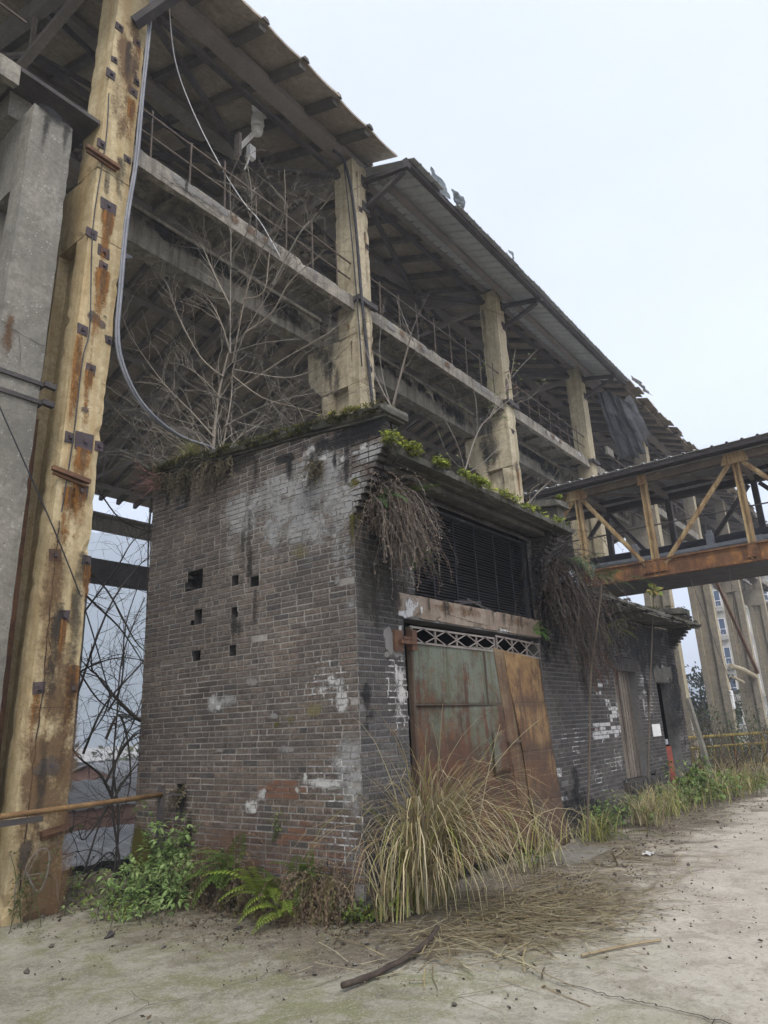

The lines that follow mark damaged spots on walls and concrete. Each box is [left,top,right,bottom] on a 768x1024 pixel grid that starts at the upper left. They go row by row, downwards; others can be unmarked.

corrosion [127,97,135,127]
corrosion [69,210,114,422]
water stain [159,440,407,624]
peeling [398,598,423,618]